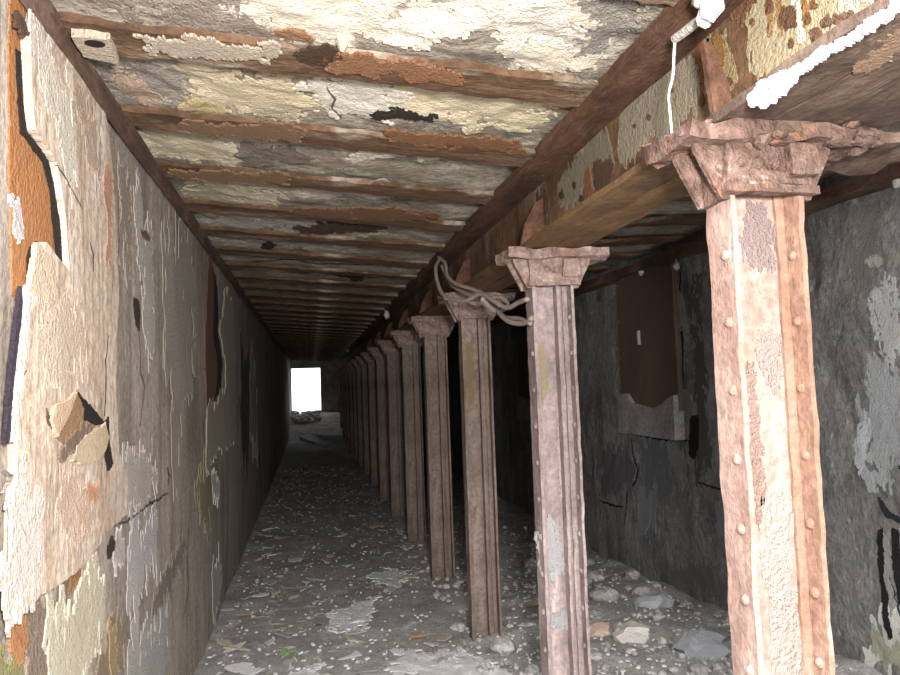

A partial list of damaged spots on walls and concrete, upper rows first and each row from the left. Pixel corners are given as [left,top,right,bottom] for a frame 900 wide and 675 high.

spalling [273,27,316,42]
peeling [704,28,738,91]
peeling [745,0,874,81]
leakage [746,0,900,109]
hole [369,106,439,123]
peeling [557,55,707,212]
spalling [292,221,387,235]
flaking render [3,11,129,612]
flaking render [864,254,900,371]
crack [119,467,170,525]
crack [599,435,688,525]
flaking render [883,531,897,617]